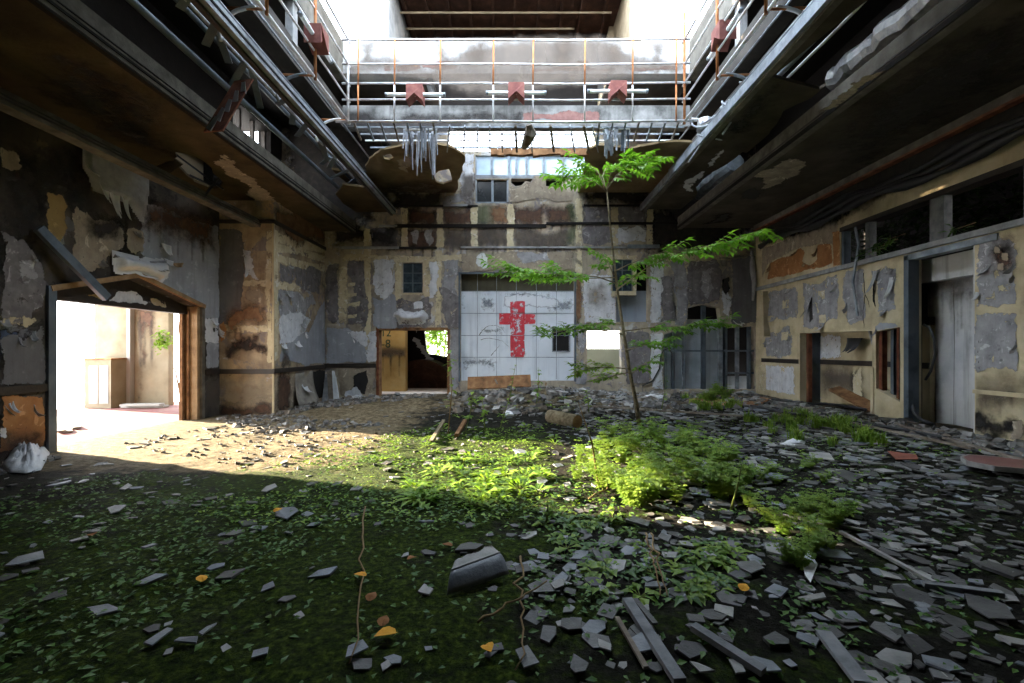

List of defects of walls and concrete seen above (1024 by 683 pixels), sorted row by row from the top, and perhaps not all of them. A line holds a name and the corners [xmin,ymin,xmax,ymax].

flaking render [46,192,68,244]
peeling [99,182,132,220]
peeling [132,251,184,279]
peeling [88,291,166,308]